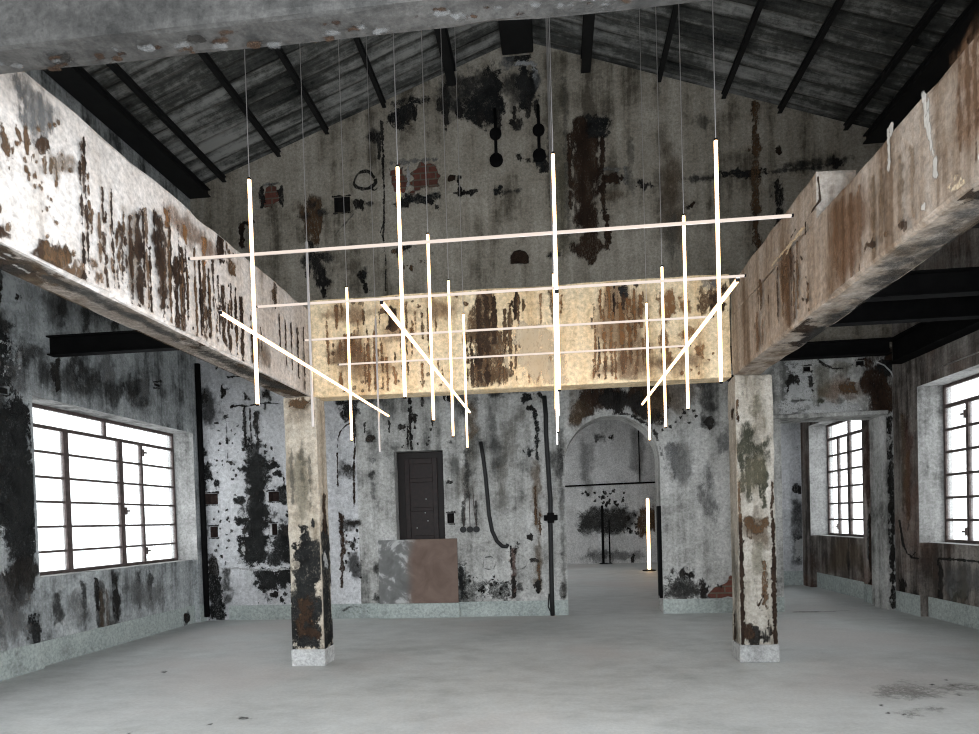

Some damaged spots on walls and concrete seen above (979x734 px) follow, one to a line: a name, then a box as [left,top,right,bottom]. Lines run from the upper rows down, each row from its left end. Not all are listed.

spalling [332,169,377,215]
flaking render [390,158,462,195]
water stain [597,136,612,251]
water stain [922,92,938,179]
rust [163,208,236,277]
rust [325,296,448,392]
rust [539,290,563,324]
rust [590,279,722,380]
water stain [782,315,834,347]
water stain [242,404,266,449]
water stain [738,454,769,544]
spalling [700,482,746,645]